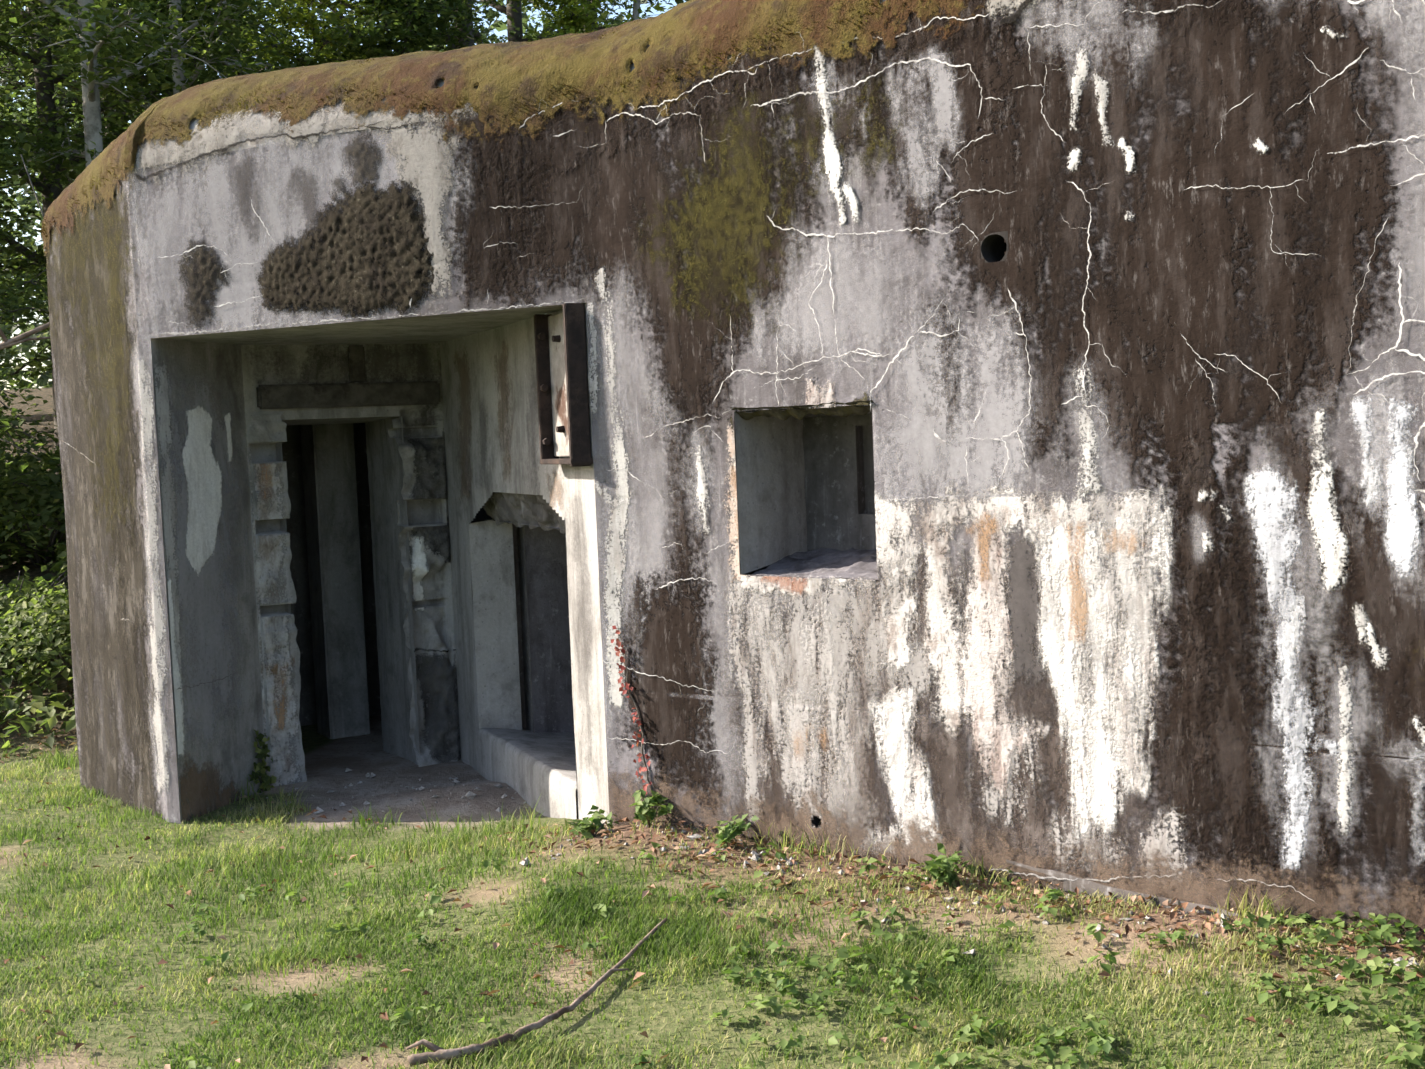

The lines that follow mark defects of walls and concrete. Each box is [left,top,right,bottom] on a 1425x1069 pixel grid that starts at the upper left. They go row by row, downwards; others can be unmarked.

crack [1125,0,1222,14]
crack [1348,0,1424,18]
crack [1285,48,1425,113]
crack [519,0,1099,491]
crack [1185,180,1318,255]
crack [1174,322,1279,403]
crack [1327,134,1425,510]
damp [46,129,441,823]
damp [440,0,1425,934]
crack [656,542,728,590]
rust [976,515,997,581]
rust [1068,523,1087,640]